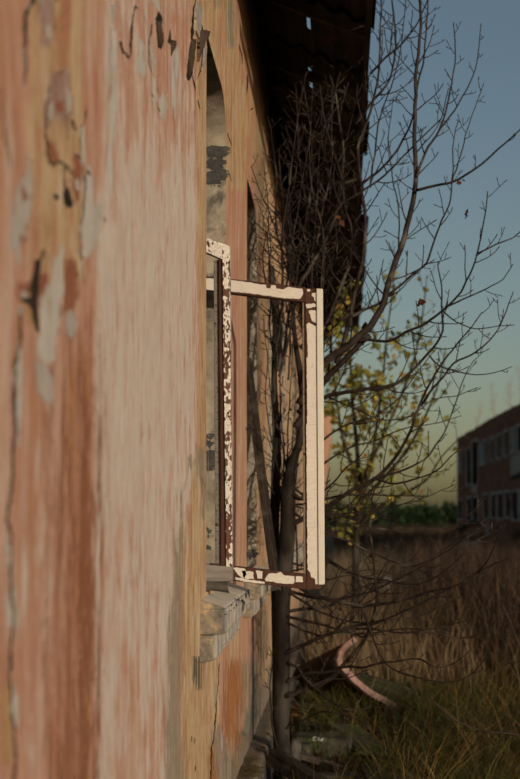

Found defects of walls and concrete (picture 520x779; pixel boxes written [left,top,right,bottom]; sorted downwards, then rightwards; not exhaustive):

peeling [107,26,121,194]
spalling [137,0,207,121]
peeling [10,153,37,268]
peeling [17,65,106,405]
peeling [231,280,318,584]
crack [1,312,23,779]
crack [210,663,220,779]